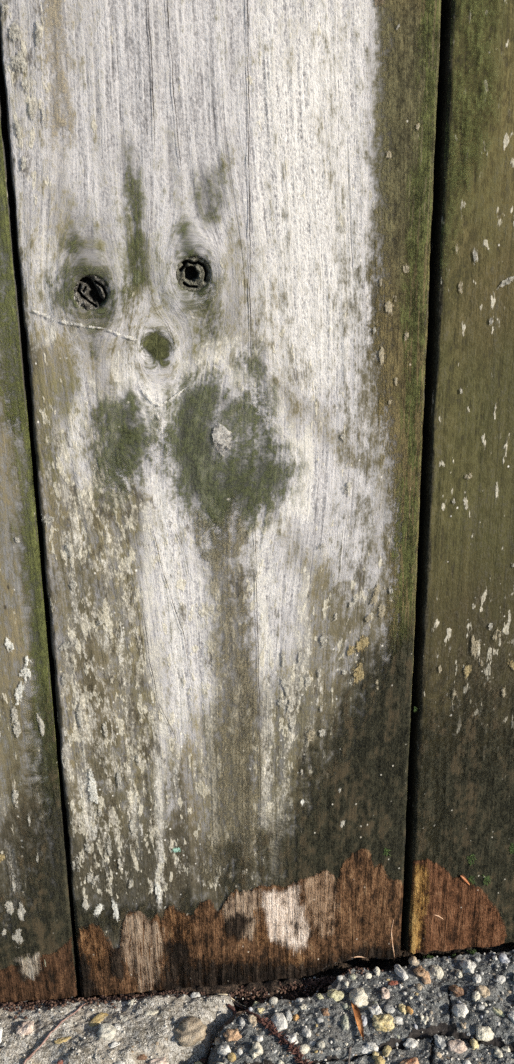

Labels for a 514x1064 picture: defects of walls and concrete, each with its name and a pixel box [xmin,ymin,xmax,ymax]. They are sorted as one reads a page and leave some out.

leakage [44,0,71,135]
leakage [0,122,199,994]
leakage [90,0,514,943]